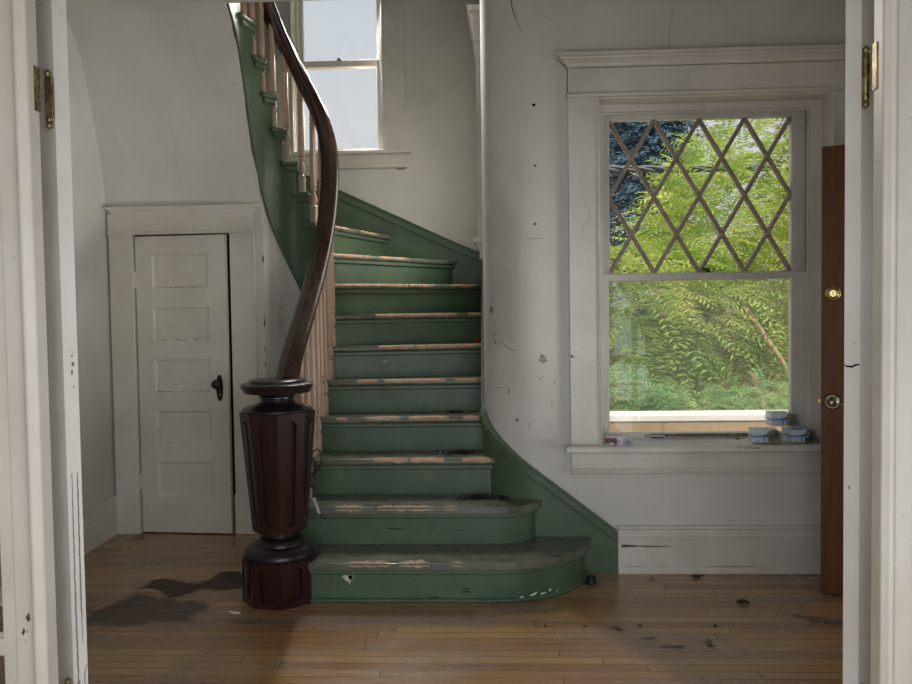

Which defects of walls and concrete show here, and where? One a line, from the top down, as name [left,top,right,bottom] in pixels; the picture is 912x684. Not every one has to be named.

peeling [366,412,486,428]
peeling [373,451,449,463]
peeling [377,496,458,511]
peeling [342,559,430,584]
water stain [86,572,242,625]